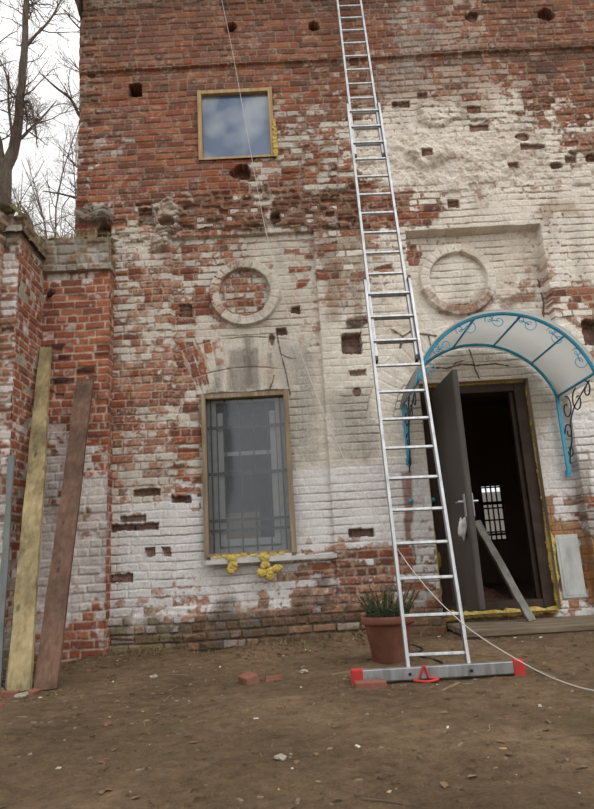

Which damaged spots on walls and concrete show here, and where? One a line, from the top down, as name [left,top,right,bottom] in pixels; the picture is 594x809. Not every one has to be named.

spalling [516,135,546,150]
spalling [550,149,594,170]
peeling [422,282,594,359]
peeling [113,332,141,348]
crack [391,329,437,348]
crack [431,349,509,379]
peeling [171,340,213,511]
spalling [133,488,160,497]
peeling [574,495,594,530]
spalling [106,573,133,584]